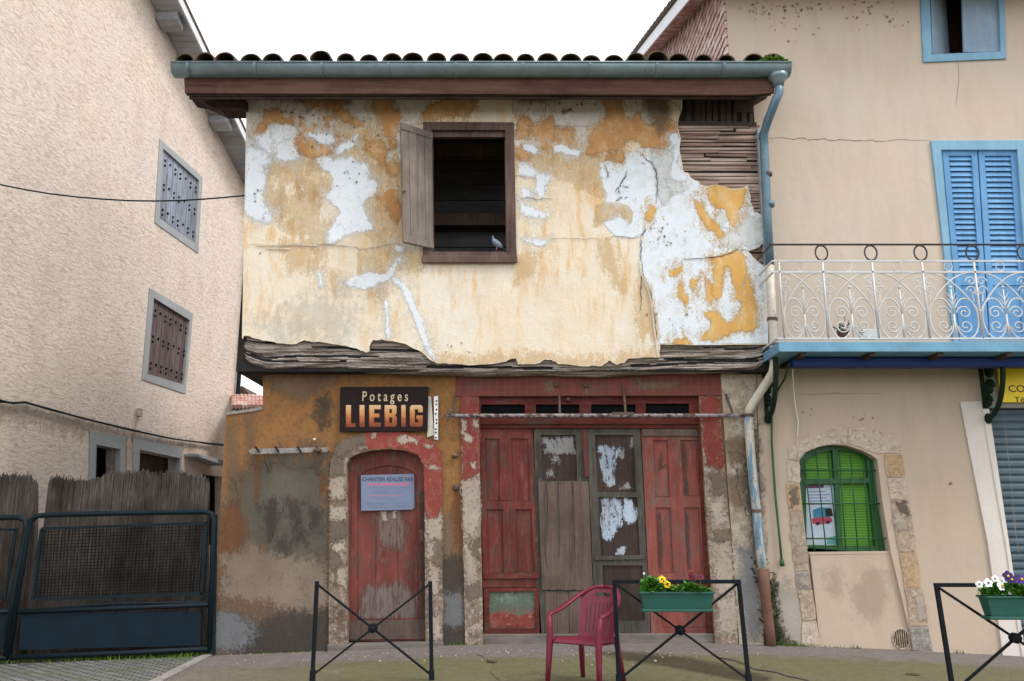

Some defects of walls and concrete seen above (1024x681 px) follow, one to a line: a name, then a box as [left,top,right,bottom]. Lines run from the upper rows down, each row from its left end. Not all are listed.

leakage [216,417,336,655]
leakage [263,374,336,430]
flaking render [245,100,478,360]
peeling [328,431,444,640]
peeling [460,396,542,629]
crack [553,229,659,351]
flaking render [512,100,768,346]
crack [769,135,907,143]